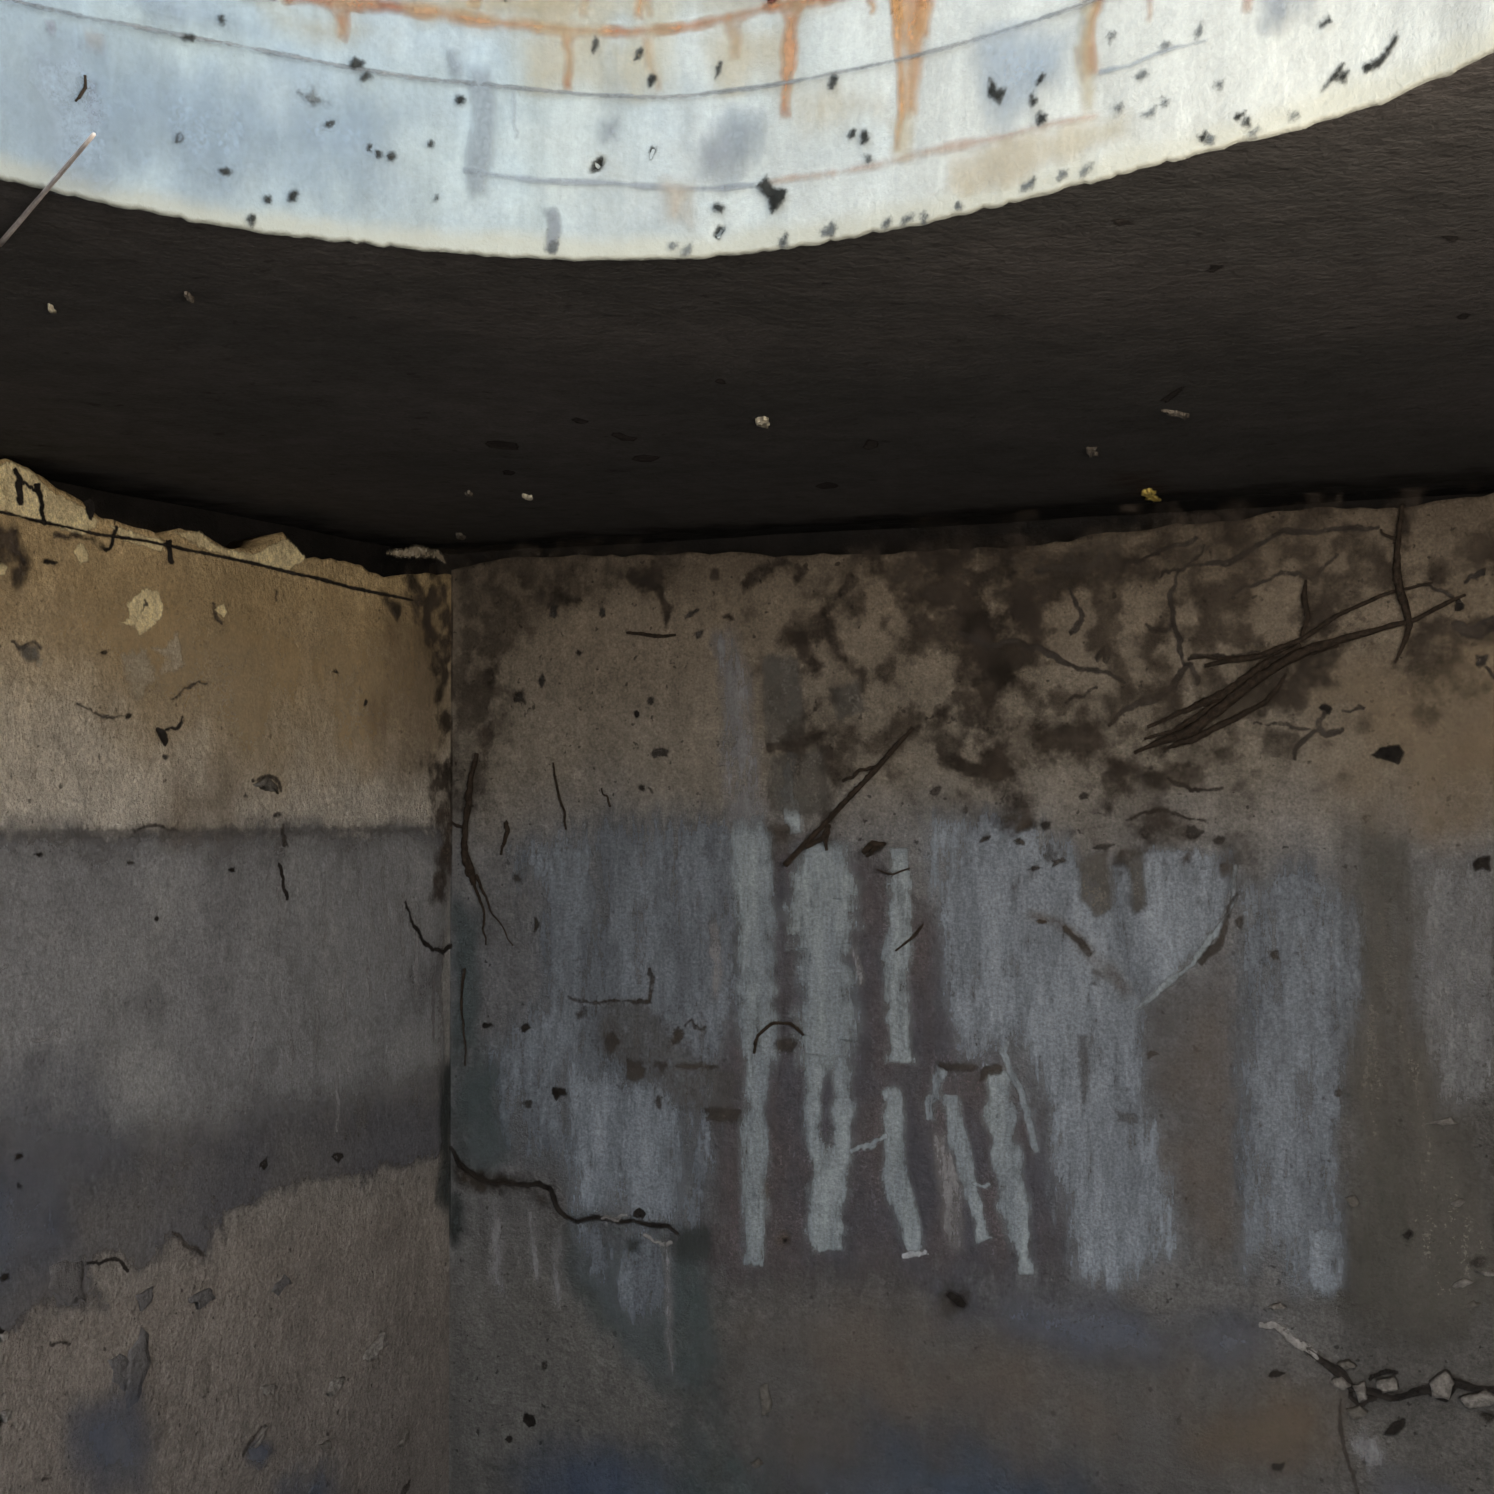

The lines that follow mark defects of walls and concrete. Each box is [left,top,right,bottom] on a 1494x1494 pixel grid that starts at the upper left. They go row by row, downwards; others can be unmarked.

corrosion [311,0,744,87]
corrosion [761,0,831,112]
corrosion [892,0,930,139]
peeling [0,462,305,571]
peeling [387,547,446,563]
crack [956,524,1380,727]
damp [1375,617,1494,772]
damp [528,510,1266,1397]
peeling [0,812,447,1334]
damp [1304,826,1494,1336]
crack [450,1146,680,1246]
crack [1258,1320,1494,1494]